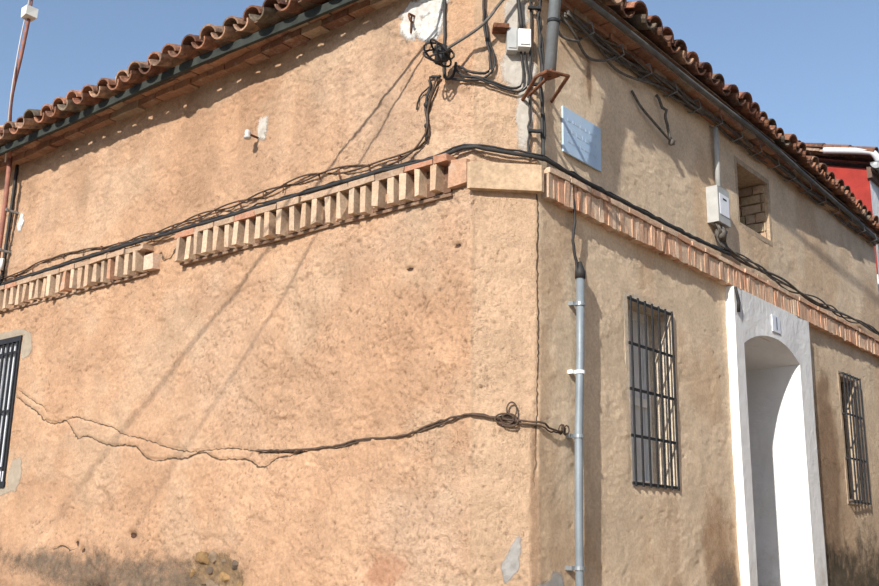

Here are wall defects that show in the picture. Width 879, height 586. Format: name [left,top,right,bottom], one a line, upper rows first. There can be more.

crack [19,390,309,468]
spalling [186,551,243,586]